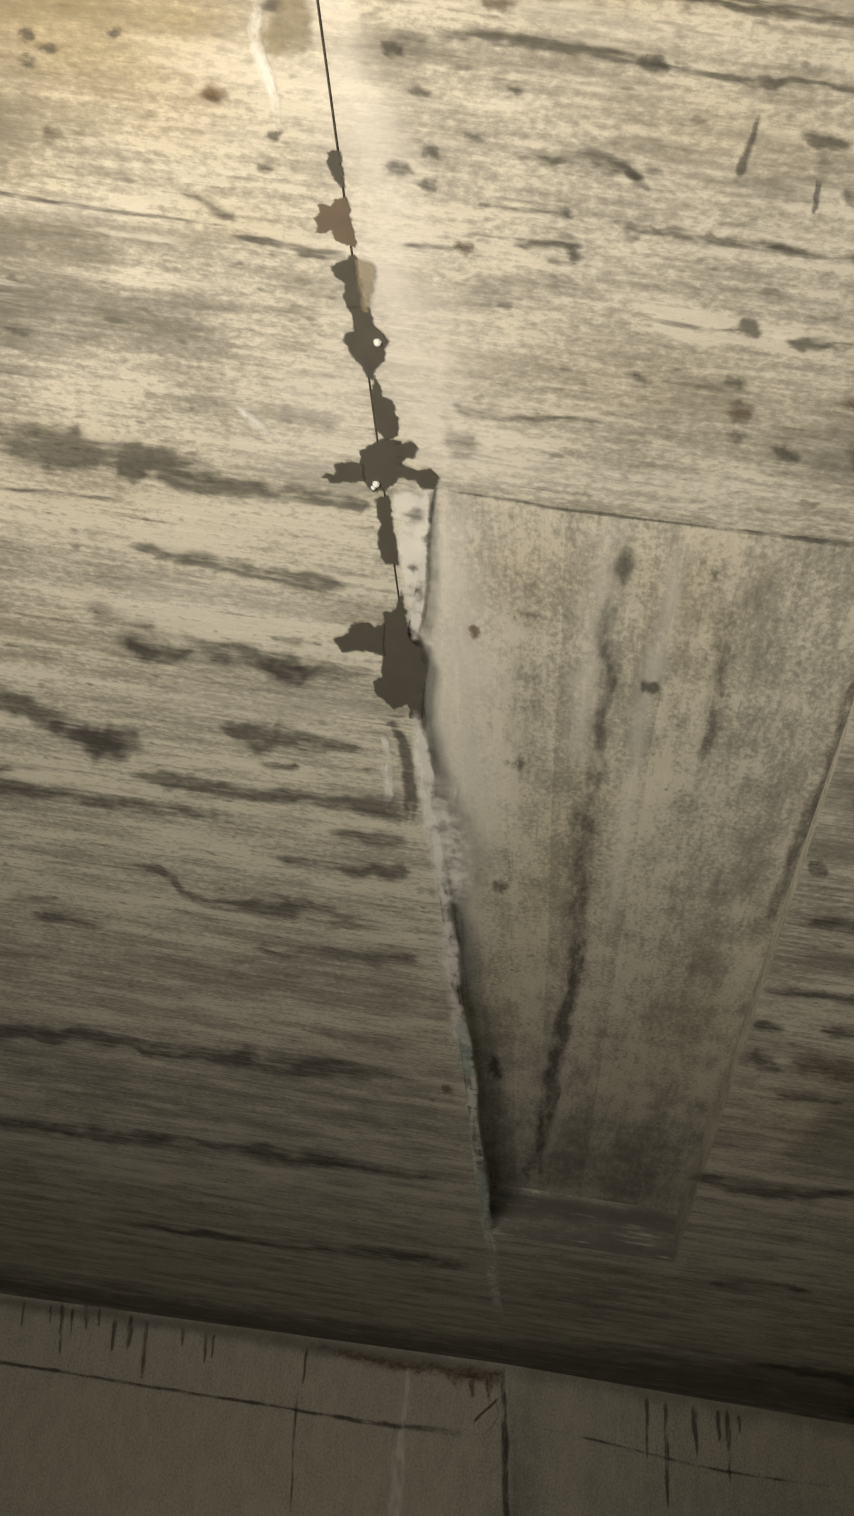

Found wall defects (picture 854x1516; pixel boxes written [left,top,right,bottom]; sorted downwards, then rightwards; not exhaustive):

water stain [8,428,278,498]
crack [406,619,414,642]
water stain [128,150,502,1314]
water stain [0,768,54,796]
water stain [787,782,823,878]
crack [420,715,490,1229]
water stain [782,992,853,1001]
water stain [0,1026,255,1066]
water stain [536,946,580,1152]